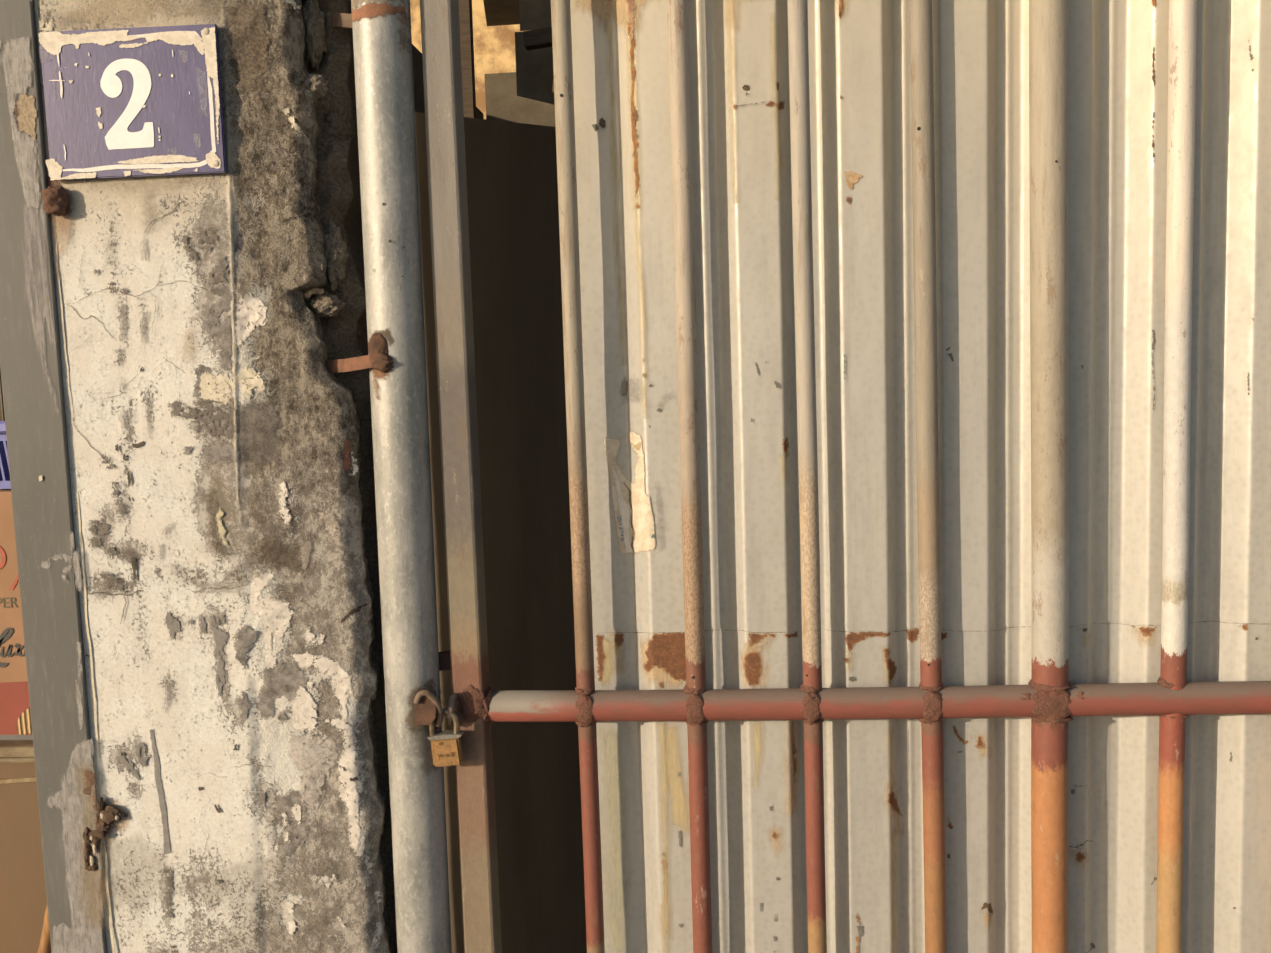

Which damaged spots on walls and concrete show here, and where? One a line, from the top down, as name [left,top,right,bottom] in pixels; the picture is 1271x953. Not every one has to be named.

rust [582,0,645,208]
flaking render [343,440,359,475]
spalling [278,481,291,525]
spalling [300,541,312,569]
spalling [318,510,347,561]
rust [643,632,686,688]
rust [743,632,798,686]
rust [844,628,920,682]
peeling [164,572,383,906]
peeling [115,729,174,918]
peeling [281,897,302,934]